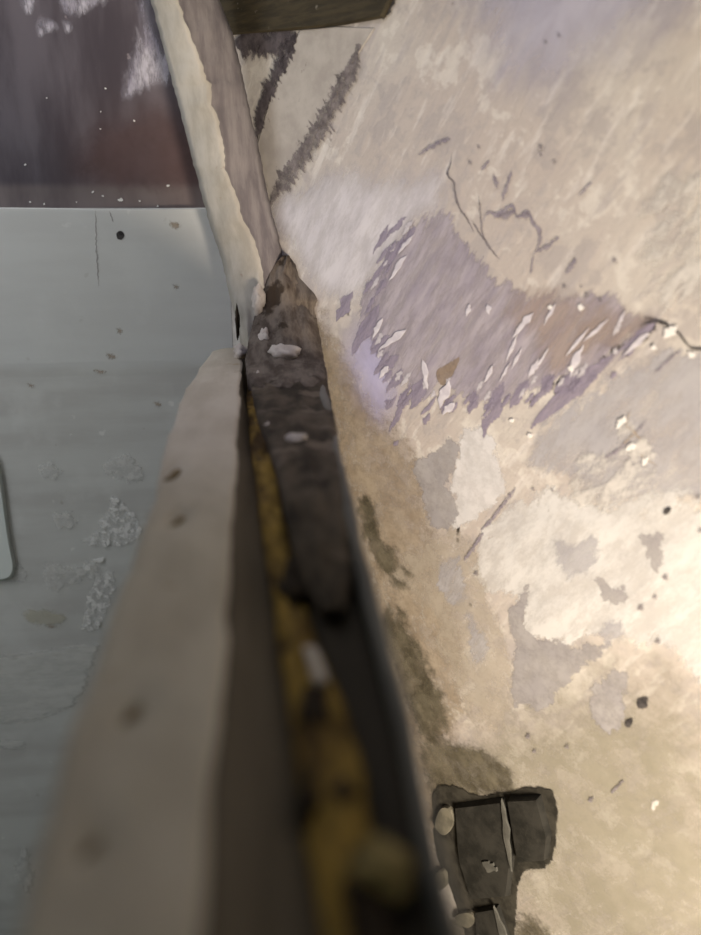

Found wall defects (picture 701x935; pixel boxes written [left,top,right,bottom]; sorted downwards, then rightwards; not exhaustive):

crack [446,155,559,273]
peeling [336,210,677,438]
crack [640,320,701,350]
spalling [358,497,409,588]
peeling [413,440,461,530]
spalling [464,488,516,562]
leakage [318,325,701,935]
peeling [508,584,623,712]
peeling [595,577,628,606]
peeling [599,416,656,466]
peeling [639,531,668,580]